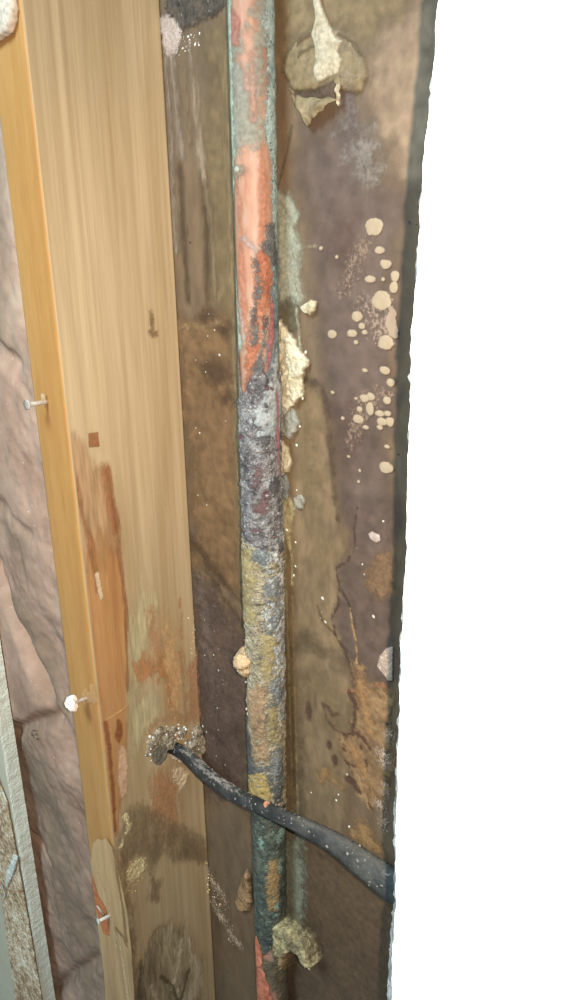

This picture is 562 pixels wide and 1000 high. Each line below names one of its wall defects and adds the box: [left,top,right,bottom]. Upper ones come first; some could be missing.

peeling [281,0,438,189]
peeling [328,218,399,350]
peeling [341,366,395,458]
peeling [379,462,393,473]
crack [320,507,375,686]
corrosion [132,615,200,736]
corrosion [322,663,397,811]